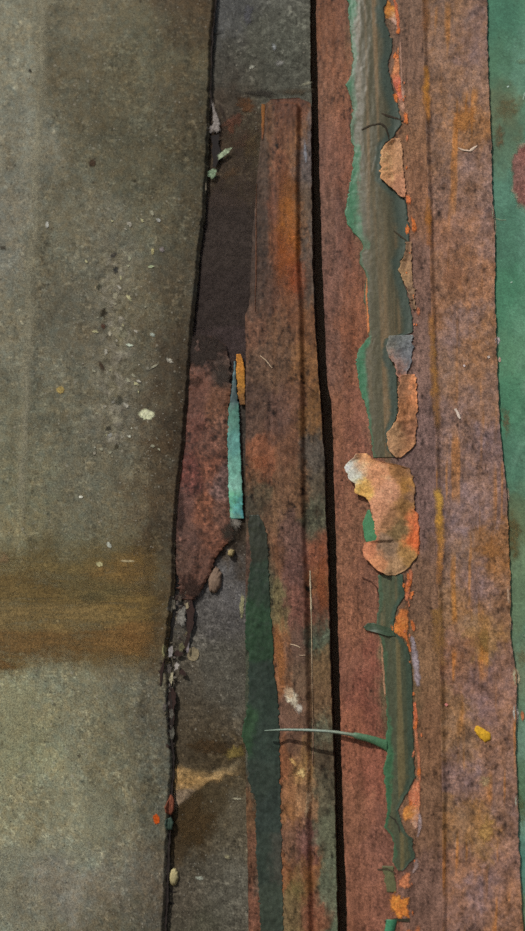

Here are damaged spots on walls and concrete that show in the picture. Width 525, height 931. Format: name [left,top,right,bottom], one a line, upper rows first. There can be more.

rust [511,143,525,205]
rust [236,354,246,405]
peeling [227,0,422,931]
rust [435,492,443,573]